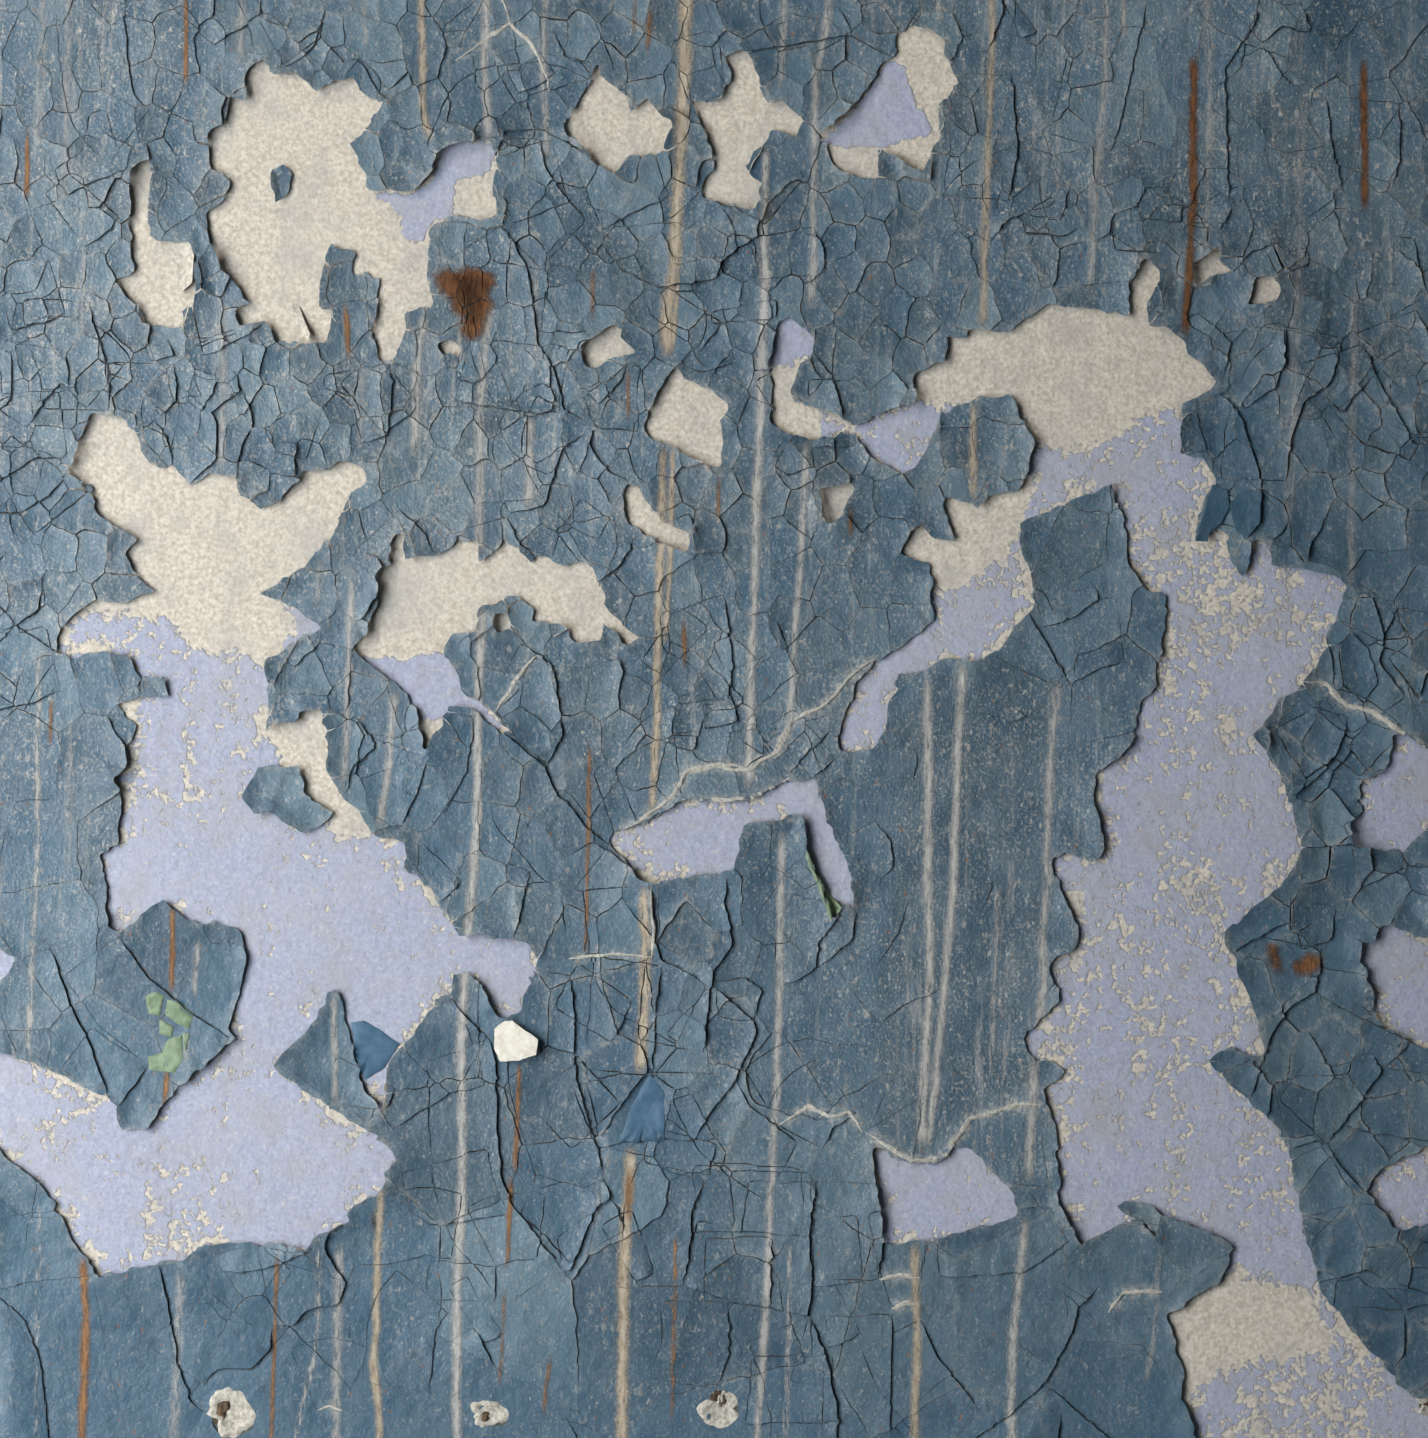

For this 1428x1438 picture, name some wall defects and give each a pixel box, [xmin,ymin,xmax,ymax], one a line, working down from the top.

crack [0,294,110,560]
peeling [101,19,516,378]
corrosion [434,268,494,339]
crack [455,129,764,556]
peeling [519,11,985,242]
corrosion [1182,61,1198,330]
corrosion [1359,66,1369,205]
peeling [0,305,750,1277]
crack [399,644,878,845]
peeling [591,199,1428,1438]
crack [158,871,1162,1438]
corrosion [78,1264,89,1438]